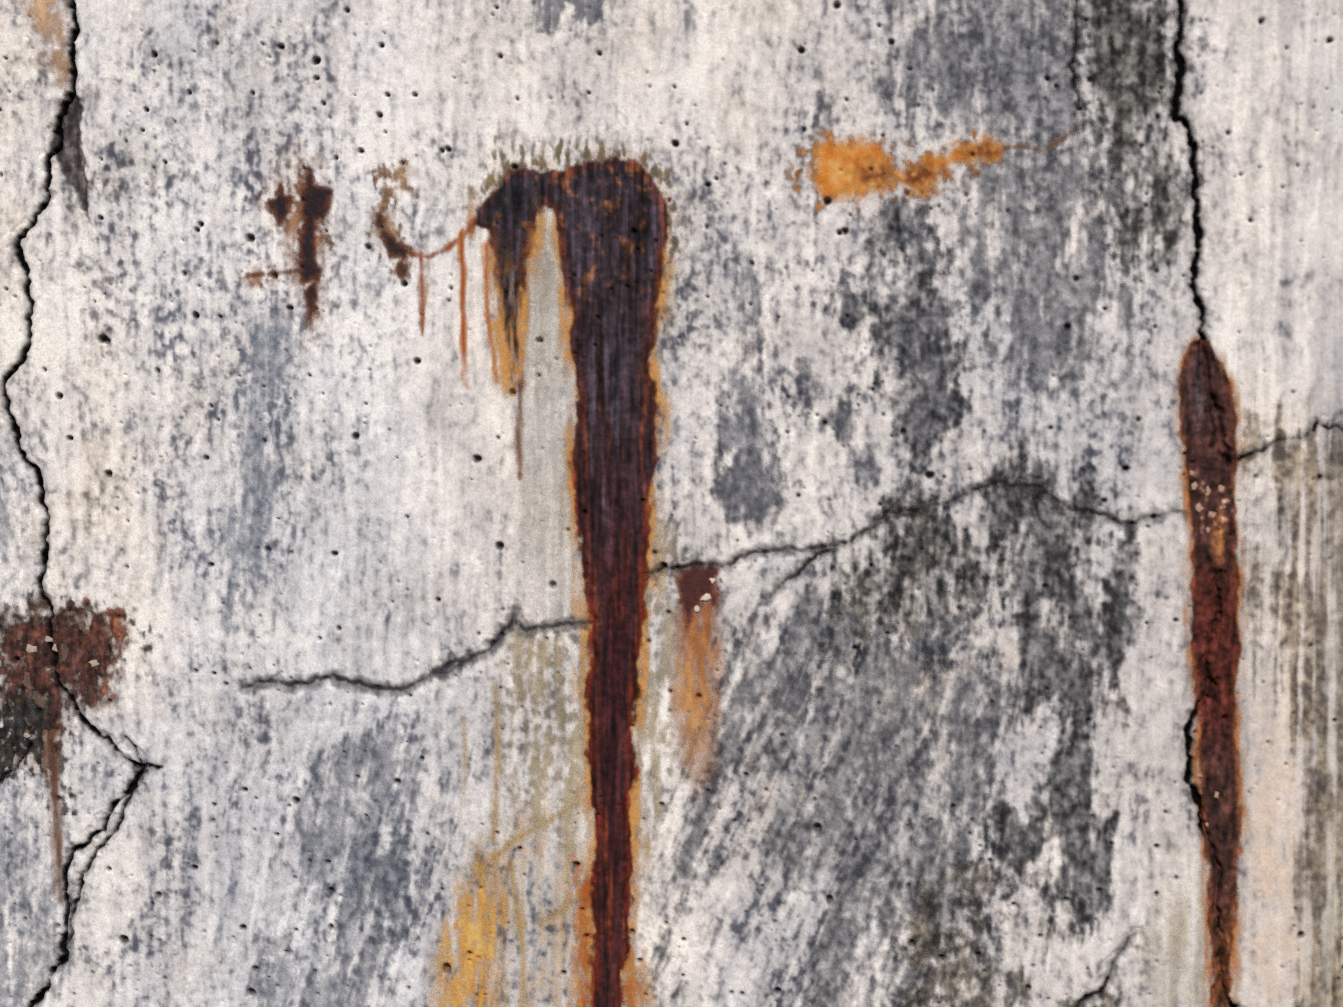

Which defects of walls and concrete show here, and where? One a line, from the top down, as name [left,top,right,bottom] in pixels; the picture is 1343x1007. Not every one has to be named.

corrosion [246,165,334,325]
corrosion [791,129,1076,211]
crack [1172,0,1206,340]
corrosion [0,593,152,900]
crack [0,0,163,1007]
crack [242,605,592,692]
corrosion [369,137,720,1007]
crack [650,480,1184,598]
crack [1183,697,1205,837]
corrosion [1179,336,1246,1007]
crack [1225,420,1343,467]
crack [1076,937,1130,1007]